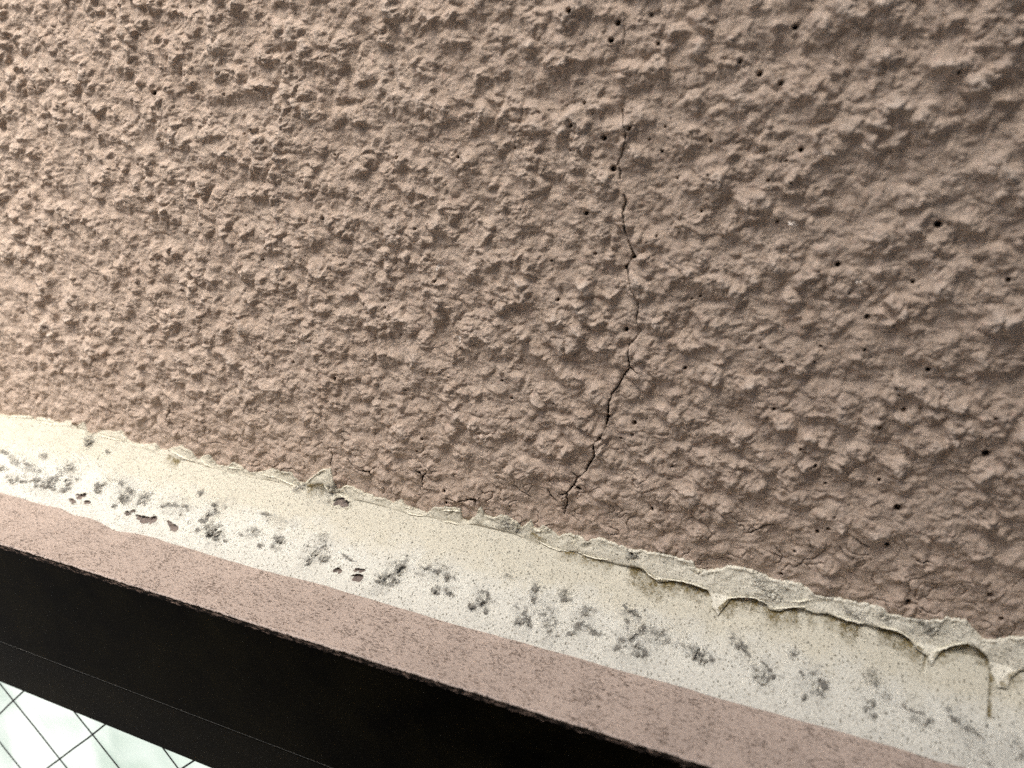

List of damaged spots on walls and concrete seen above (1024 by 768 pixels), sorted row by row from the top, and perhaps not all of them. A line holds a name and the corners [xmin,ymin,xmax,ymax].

crack [515,110,641,514]
water stain [629,566,709,599]
water stain [719,597,798,623]
peeling [722,596,813,612]
water stain [811,614,859,636]
peeling [878,626,966,655]
water stain [878,627,1022,718]